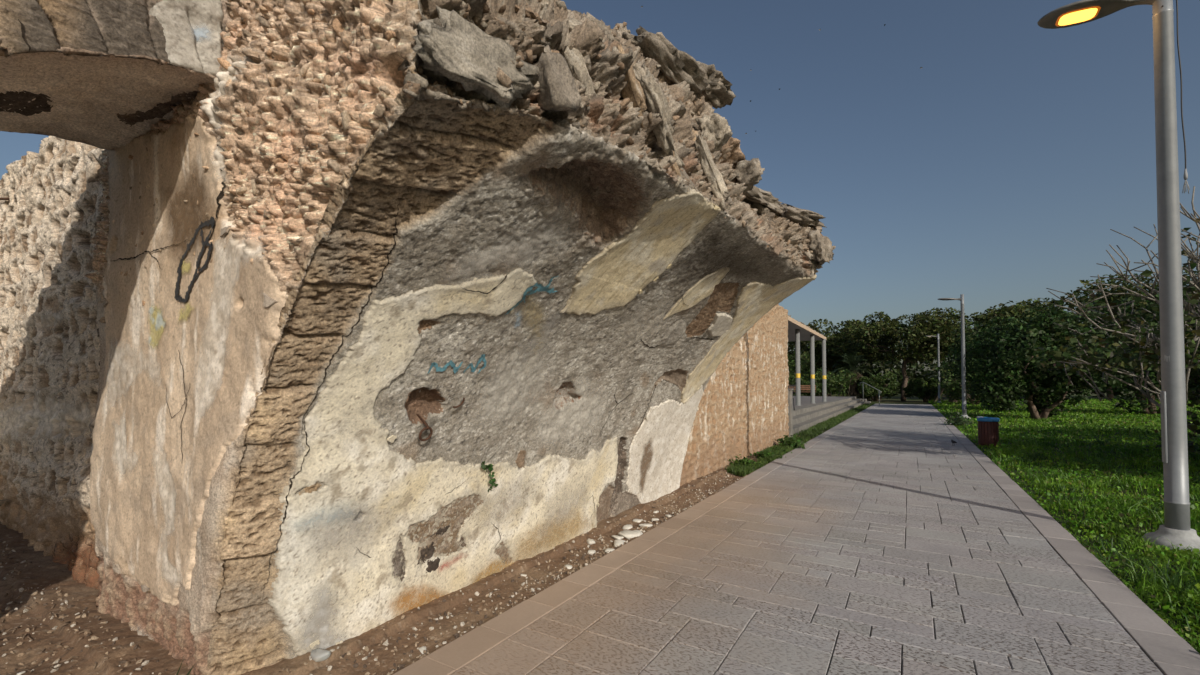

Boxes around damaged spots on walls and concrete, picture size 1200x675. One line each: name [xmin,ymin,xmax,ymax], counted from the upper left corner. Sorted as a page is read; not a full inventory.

spalling [0,90,53,116]
crack [113,123,226,269]
flaking render [148,0,224,76]
flaking render [89,91,288,606]
leakage [167,168,268,415]
leakage [201,57,254,178]
crack [262,196,403,599]
flaking render [267,267,817,656]
flaking render [528,158,721,315]